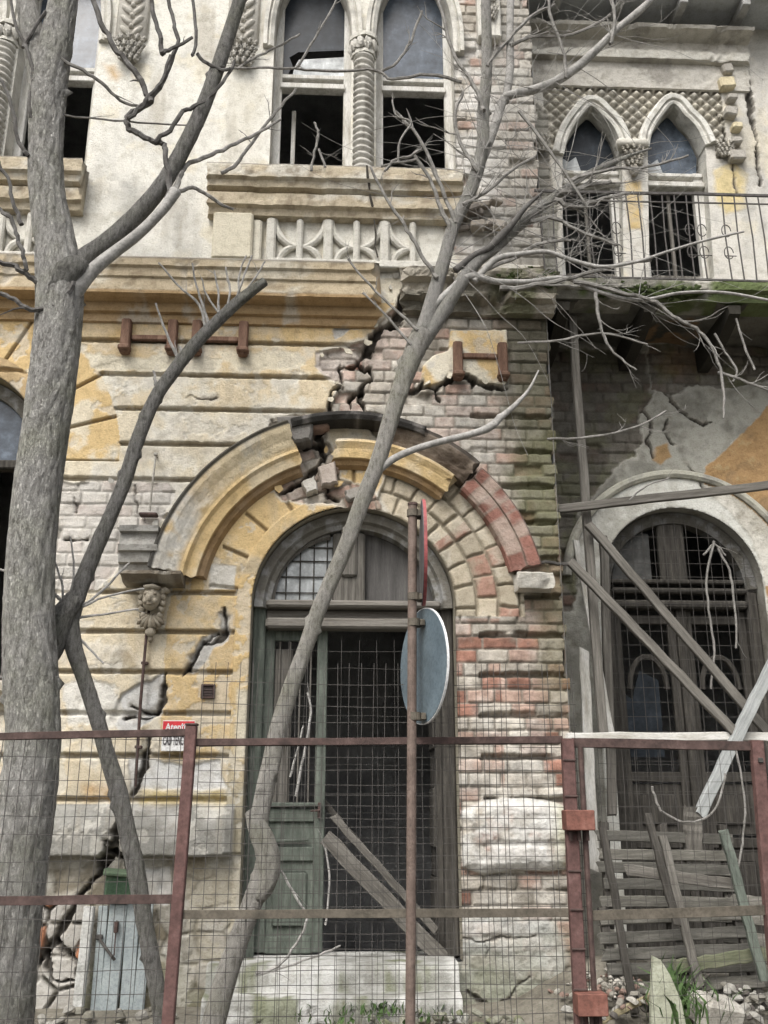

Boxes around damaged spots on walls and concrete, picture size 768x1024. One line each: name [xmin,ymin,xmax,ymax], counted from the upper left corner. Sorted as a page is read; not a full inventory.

flaking render [183,305,419,414]
flaking render [274,431,360,508]
crack [408,372,508,403]
flaking render [624,419,673,465]
flaking render [55,478,117,591]
flaking render [89,481,176,590]
peeling [61,679,90,726]
flaking render [92,671,168,730]
crack [125,606,230,796]
flaking render [368,317,579,1005]
crack [39,823,123,982]